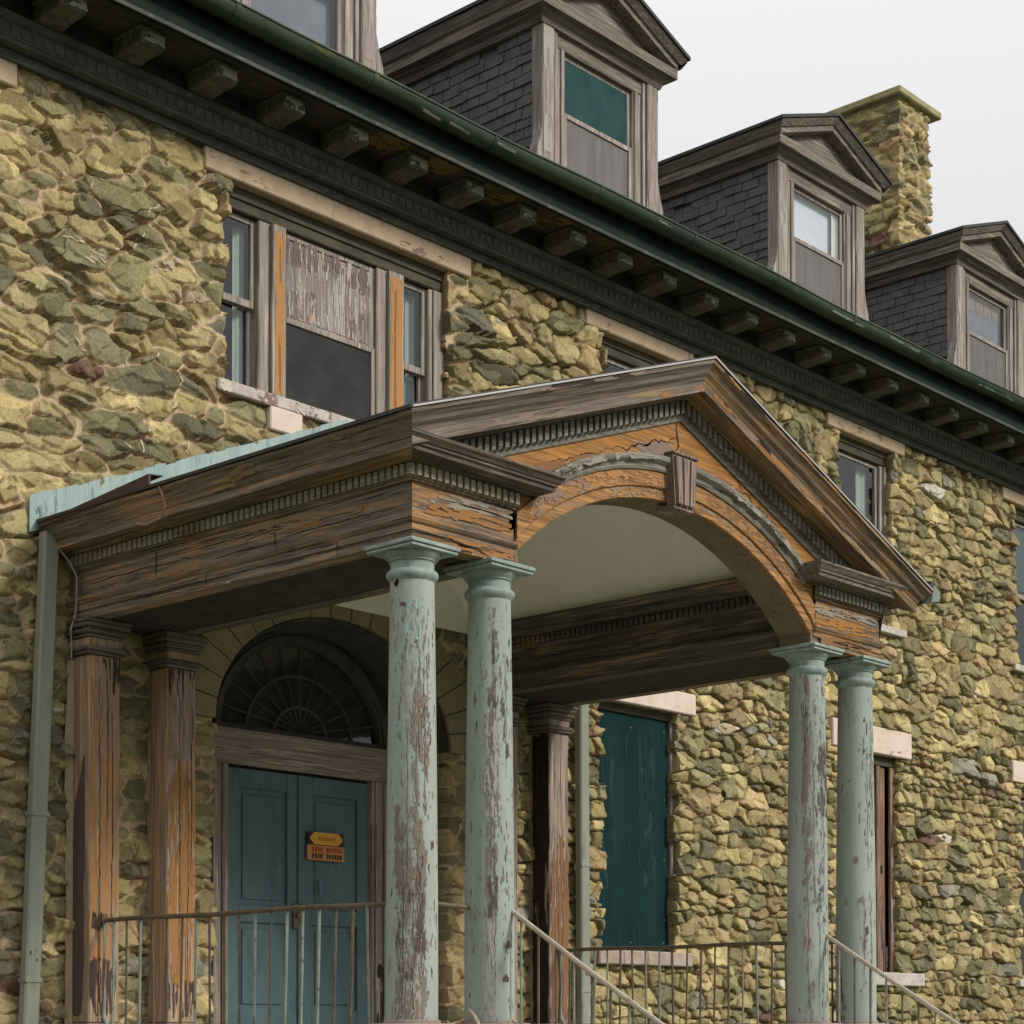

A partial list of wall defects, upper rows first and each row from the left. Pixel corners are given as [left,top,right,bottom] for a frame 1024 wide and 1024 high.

peeling [275,229,371,394]
peeling [89,674,120,985]
peeling [168,671,196,988]
peeling [387,578,438,1020]
peeling [469,602,514,1020]
peeling [551,830,569,1022]
peeling [788,673,875,1021]